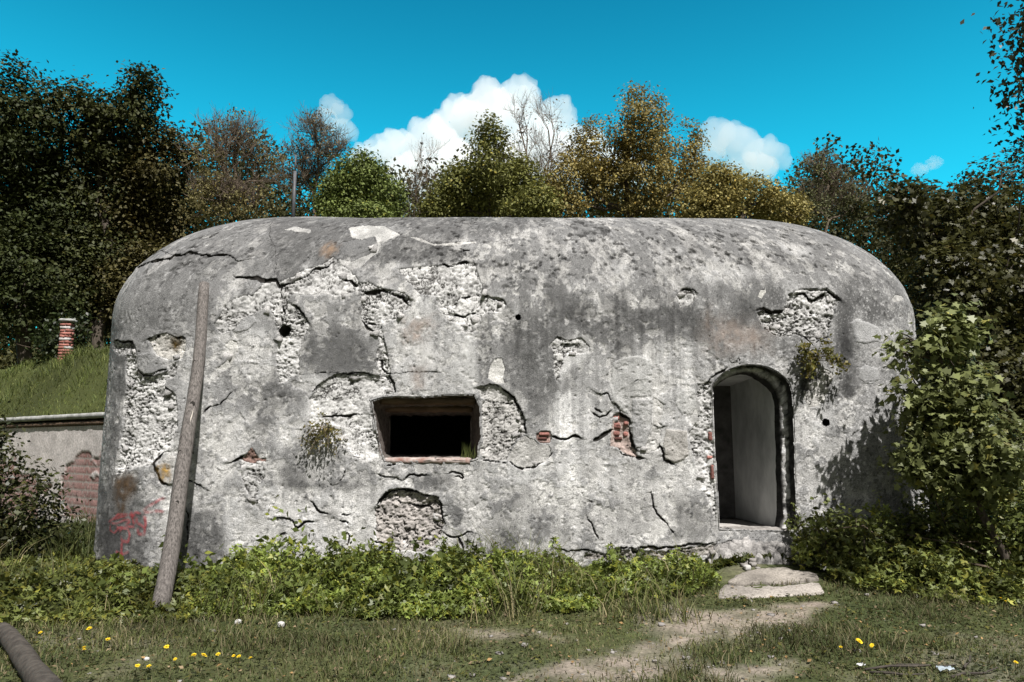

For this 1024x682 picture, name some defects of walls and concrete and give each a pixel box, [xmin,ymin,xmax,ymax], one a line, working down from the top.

crack [138,223,410,322]
flaking render [215,225,506,461]
crack [441,248,470,267]
flaking render [757,289,839,344]
flaking render [114,333,186,485]
flaking render [477,358,551,469]
peeling [610,355,665,457]
flaking render [375,489,444,551]
crack [562,492,713,554]